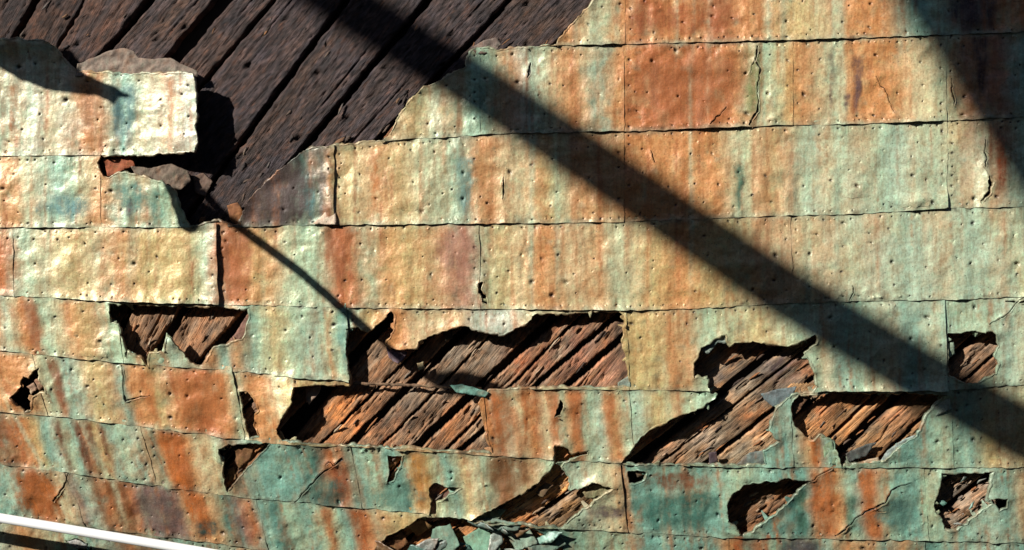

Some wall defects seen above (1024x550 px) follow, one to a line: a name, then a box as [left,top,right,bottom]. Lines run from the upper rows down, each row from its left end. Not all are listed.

peeling [75,48,199,77]
crack [709,45,763,125]
crack [982,139,990,167]
peeling [103,156,213,197]
peeling [386,346,408,364]
peeling [701,336,727,354]
peeling [353,381,489,397]
peeling [761,386,813,417]
corrosion [75,425,108,461]
peeling [581,483,610,507]
crack [835,482,912,536]
peeling [375,509,566,550]